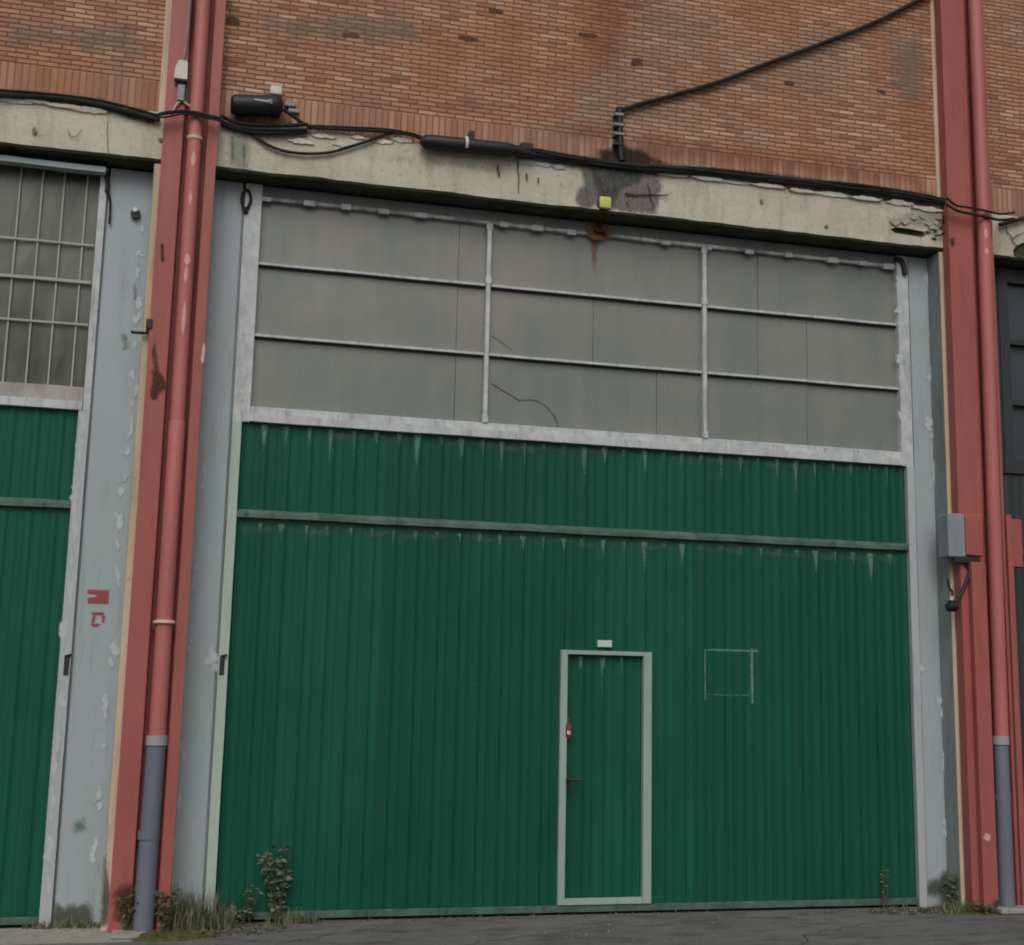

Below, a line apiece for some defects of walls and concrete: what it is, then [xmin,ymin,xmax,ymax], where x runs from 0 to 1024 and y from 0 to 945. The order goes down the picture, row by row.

water stain [576,167,661,213]
peeling [657,173,943,240]